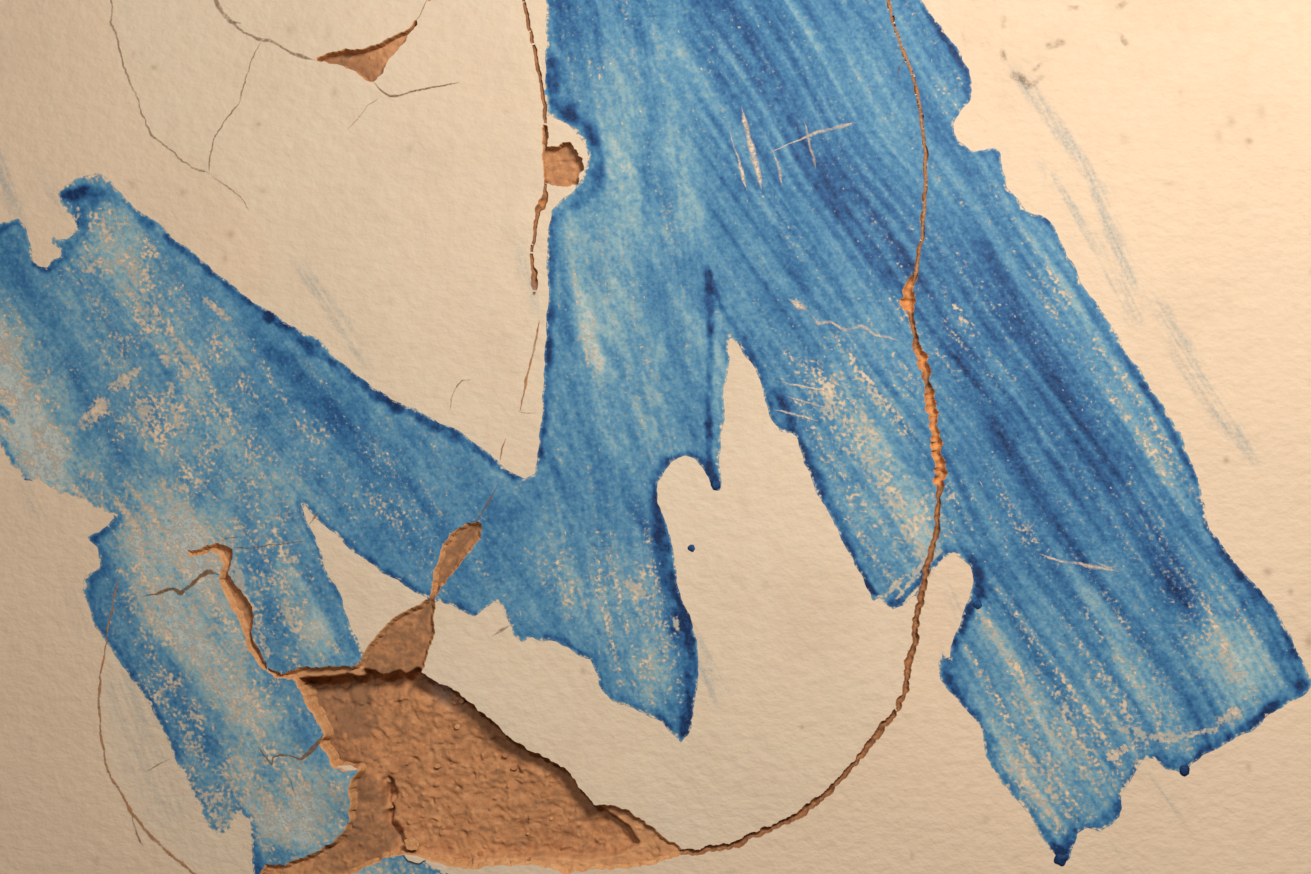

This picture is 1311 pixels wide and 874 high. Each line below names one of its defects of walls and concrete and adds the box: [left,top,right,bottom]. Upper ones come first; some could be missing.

crack [110,0,311,207]
flaking render [315,20,417,82]
crack [372,83,455,103]
crack [522,0,547,123]
flaking render [541,125,584,187]
crack [520,181,549,410]
crack [682,0,948,856]
crack [98,570,218,874]
flaking render [188,521,689,874]